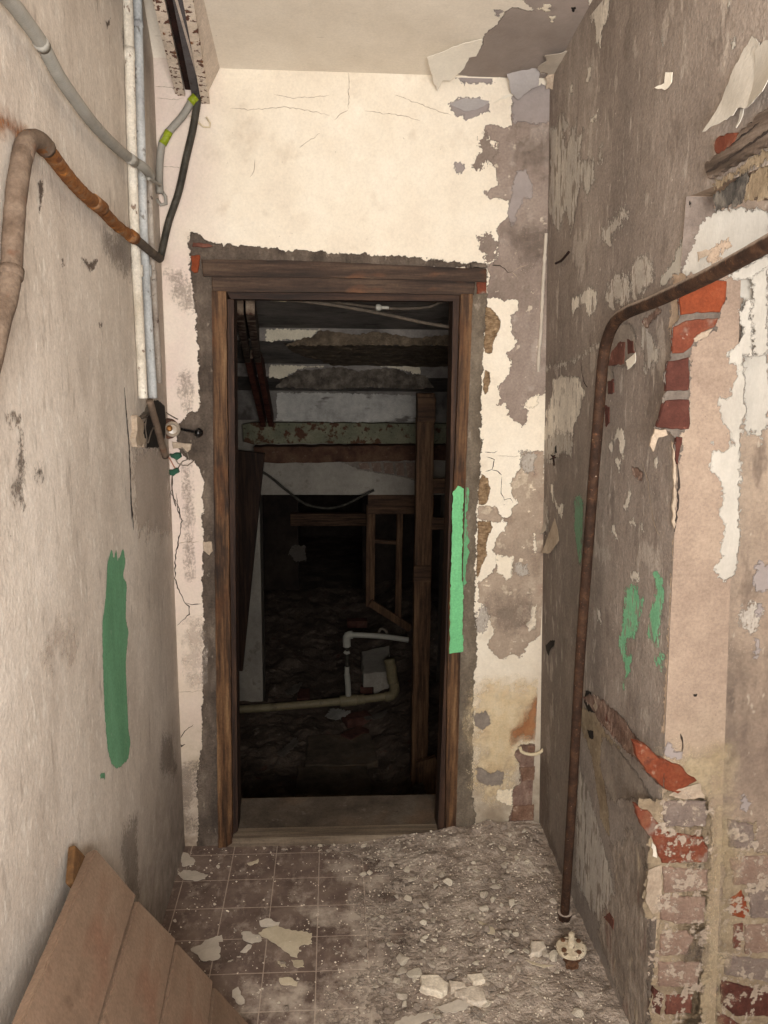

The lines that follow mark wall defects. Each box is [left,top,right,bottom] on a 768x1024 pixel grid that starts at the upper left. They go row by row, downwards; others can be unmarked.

crack [231,81,448,146]
peeling [655,72,673,90]
peeling [702,36,768,154]
peeling [660,148,768,287]
peeling [130,0,589,846]
peeling [605,254,768,582]
crack [171,478,198,625]
flaking render [581,536,768,1024]